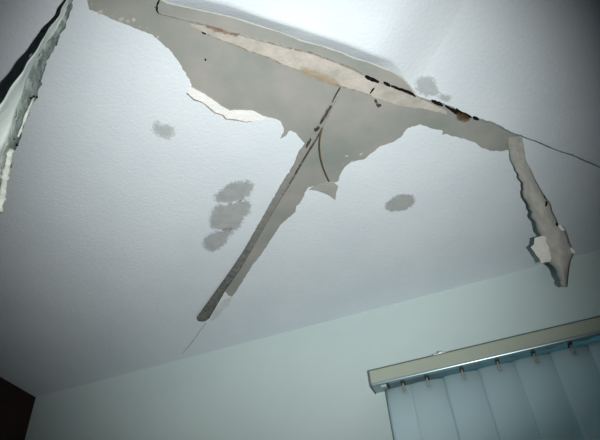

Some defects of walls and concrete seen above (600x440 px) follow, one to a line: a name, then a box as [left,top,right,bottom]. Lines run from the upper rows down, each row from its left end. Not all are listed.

damp [418,78,448,99]
peeling [87,0,522,297]
crack [479,119,600,168]
damp [203,180,254,251]
damp [386,194,414,212]